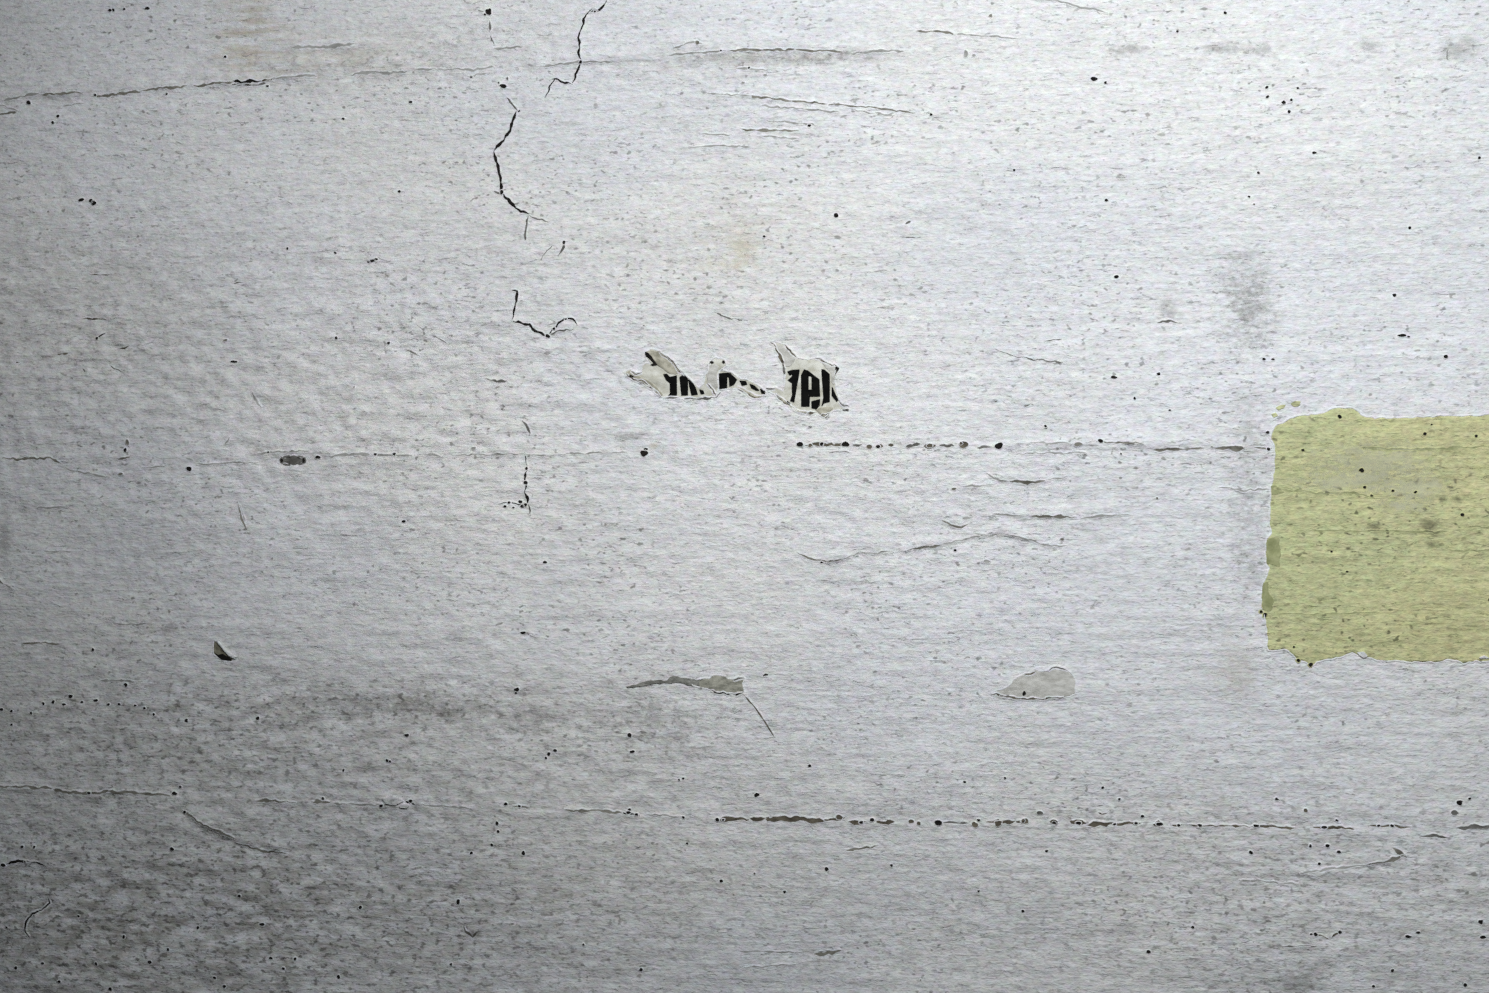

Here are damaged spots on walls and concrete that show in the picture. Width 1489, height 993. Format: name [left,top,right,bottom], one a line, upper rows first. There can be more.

crack [0,0,614,257]
crack [510,288,579,339]
peeling [624,340,851,420]
spalling [212,639,237,663]
spalling [626,672,776,738]
spalling [988,664,1077,702]